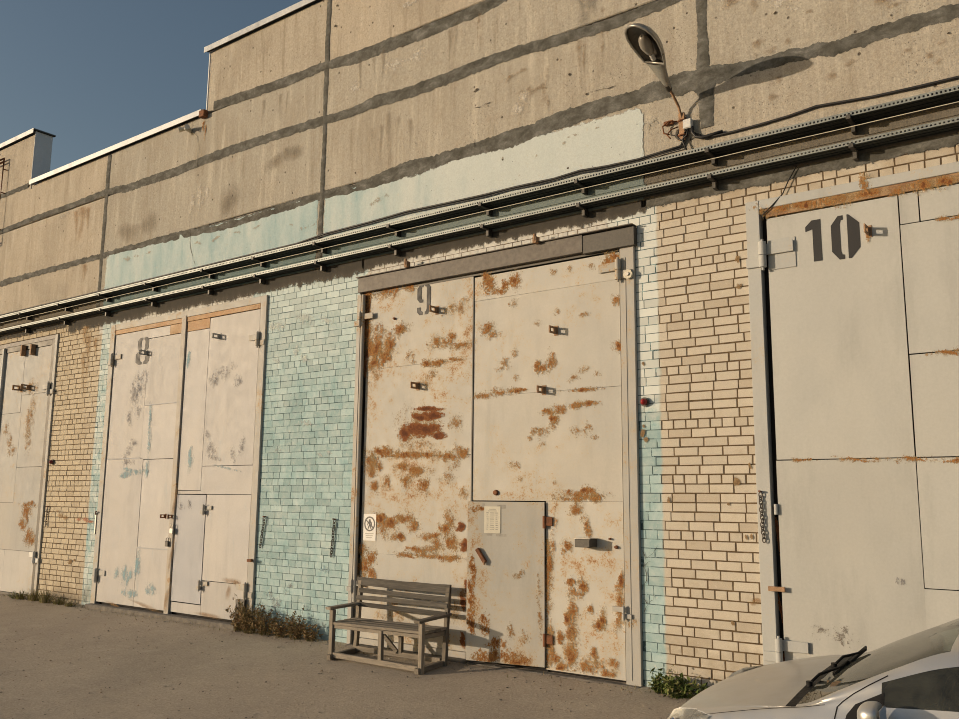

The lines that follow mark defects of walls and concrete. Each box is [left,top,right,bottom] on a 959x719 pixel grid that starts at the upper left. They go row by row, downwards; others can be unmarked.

rust [753,173,959,217]
rust [481,269,523,306]
peeling [120,373,151,479]
rust [364,285,416,391]
rust [362,406,469,497]
rust [406,321,501,387]
rust [473,350,527,400]
rust [533,353,557,375]
rust [528,366,605,445]
rust [834,456,959,464]
peeling [115,552,155,599]
rust [376,481,637,678]